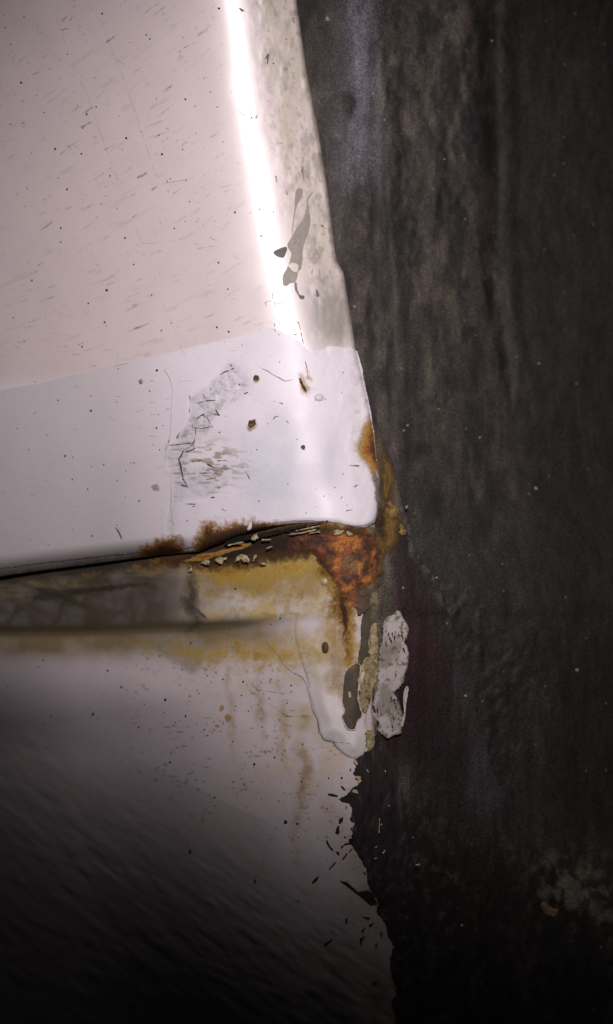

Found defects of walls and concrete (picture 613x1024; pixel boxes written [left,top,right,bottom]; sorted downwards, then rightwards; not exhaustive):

peeling [273,169,314,299]
crack [165,364,234,511]
rust [131,419,400,677]
damp [156,637,317,669]
peeling [326,610,419,1024]